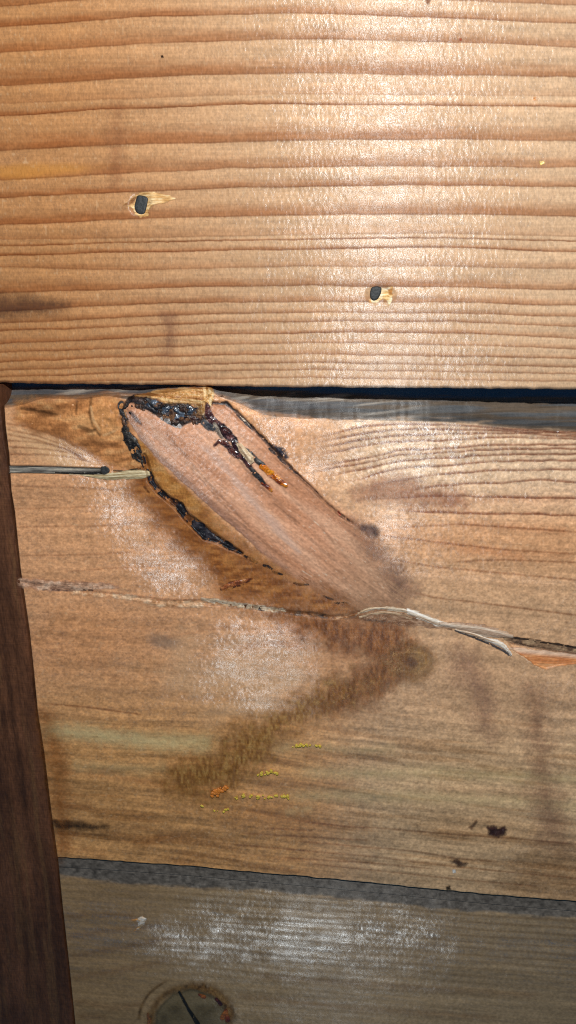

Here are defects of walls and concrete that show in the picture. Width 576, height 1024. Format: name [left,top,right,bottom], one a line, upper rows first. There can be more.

spalling [118,395,207,428]
damp [132,462,413,793]
crack [503,637,576,652]